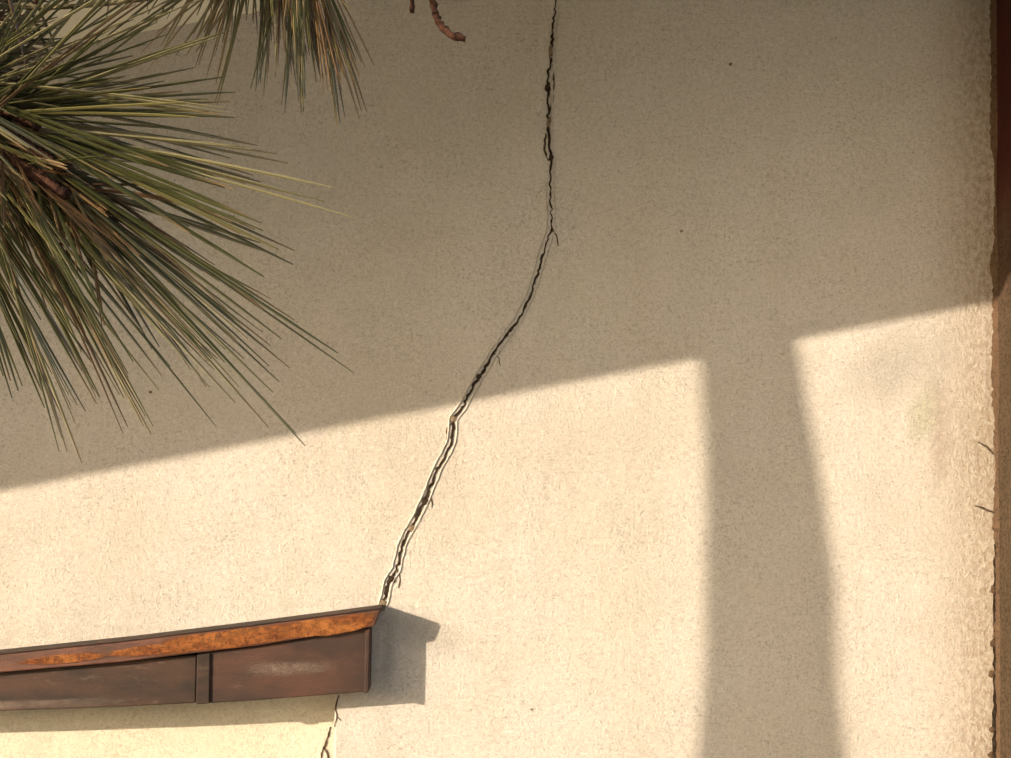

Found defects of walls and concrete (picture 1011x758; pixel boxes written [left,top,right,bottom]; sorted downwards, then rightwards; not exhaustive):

crack [378,0,560,612]
corrosion [19,613,373,664]